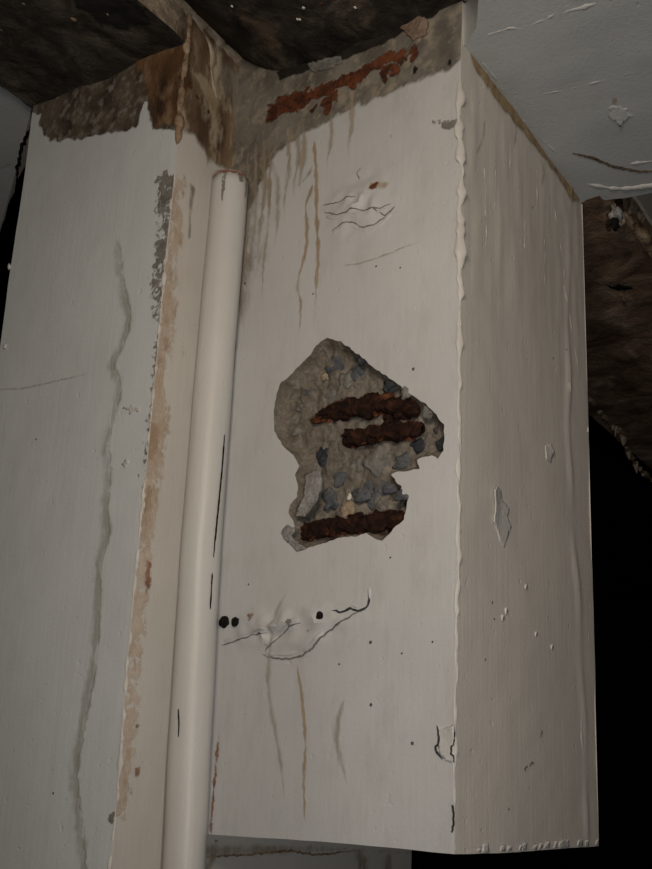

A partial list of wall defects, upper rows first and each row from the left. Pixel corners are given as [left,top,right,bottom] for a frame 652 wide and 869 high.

leakage [32,0,580,304]
corrosion [266,44,419,123]
crack [572,153,652,173]
peeling [108,170,194,824]
spalling [274,338,444,551]
peeling [493,486,512,547]
leakage [298,673,306,815]